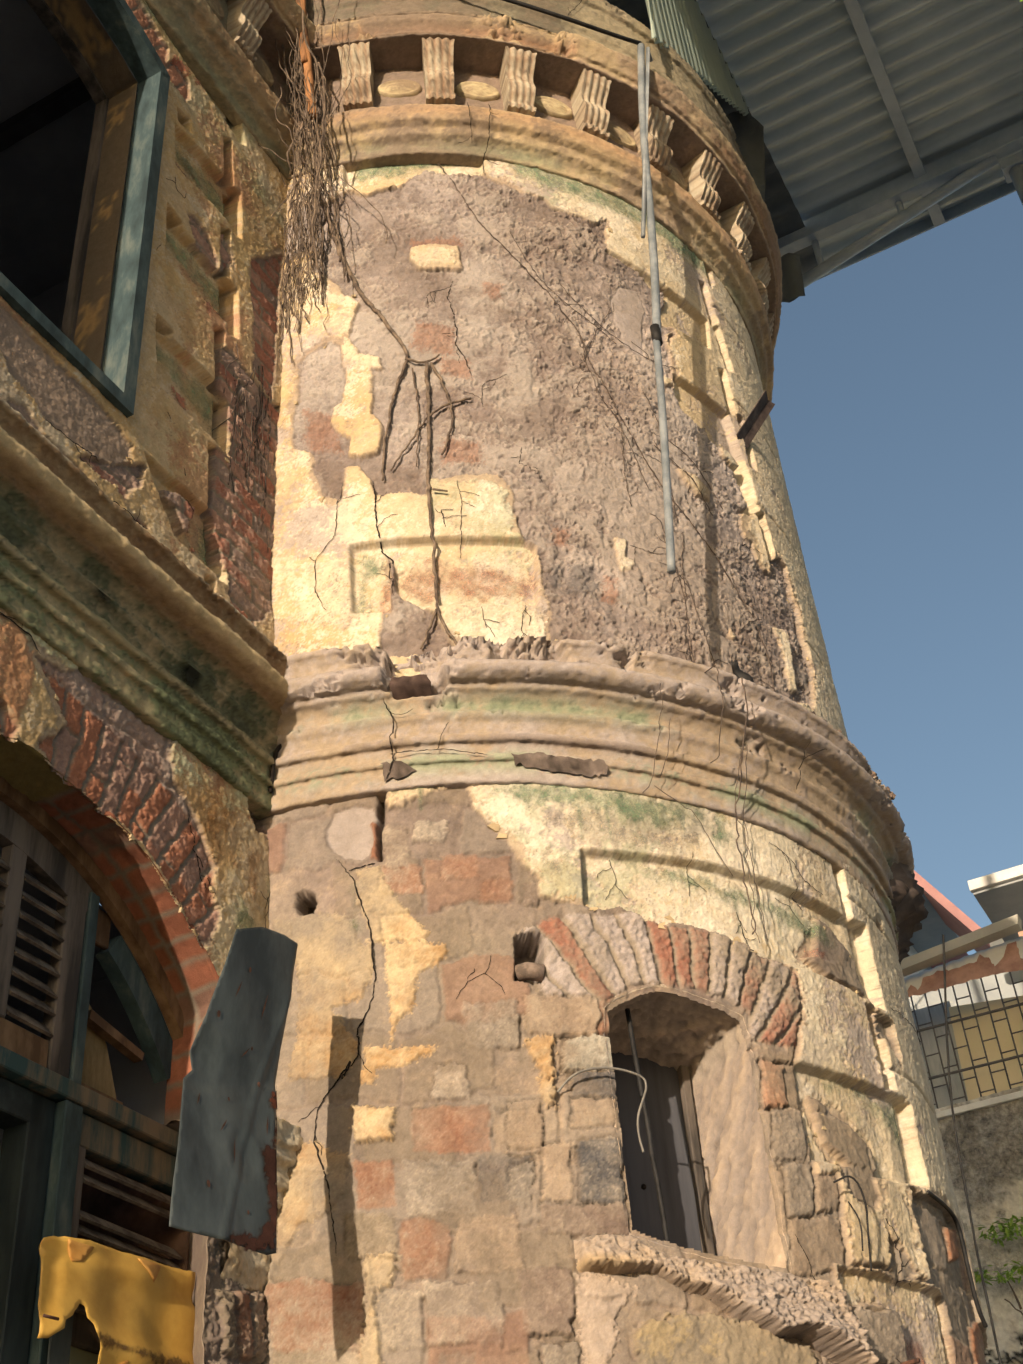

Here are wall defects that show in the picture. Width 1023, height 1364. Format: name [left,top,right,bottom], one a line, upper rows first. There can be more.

flaking render [0,305,144,498]
crack [435,484,479,558]
crack [426,281,507,404]
flaking render [160,170,814,708]
flaking render [0,622,220,947]
crack [383,699,486,779]
rust [227,1091,278,1252]
crack [299,859,377,1249]
flaking render [249,790,987,1364]
mould [984,1334,1023,1364]